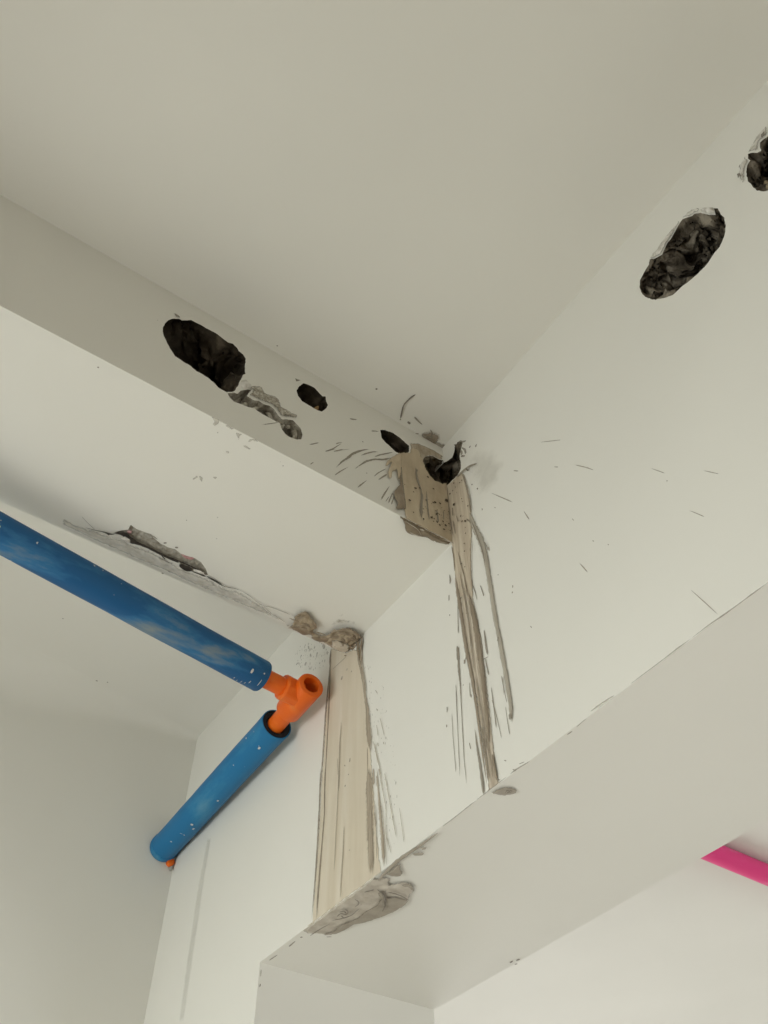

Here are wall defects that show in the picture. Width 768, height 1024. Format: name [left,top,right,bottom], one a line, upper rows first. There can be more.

spalling [228,380,302,440]
spalling [423,440,477,485]
spalling [115,525,208,577]
water stain [449,548,510,793]
water stain [308,637,404,926]